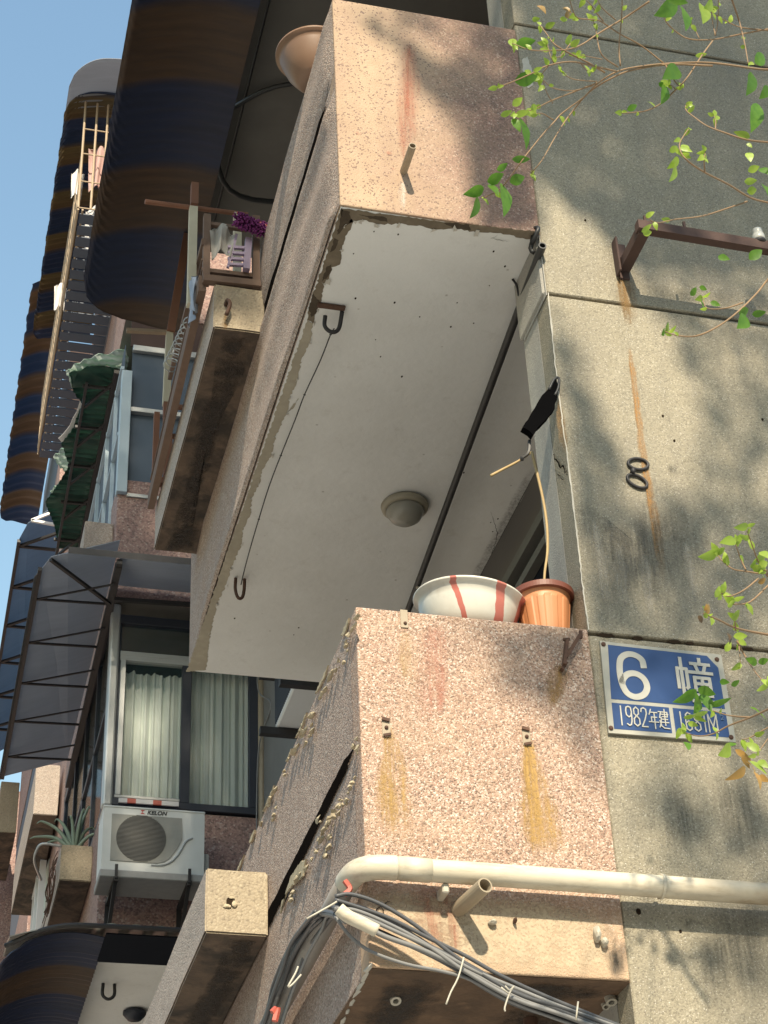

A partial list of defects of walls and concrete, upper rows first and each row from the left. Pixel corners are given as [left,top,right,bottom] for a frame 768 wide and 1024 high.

leakage [171,341,243,550]
peeling [186,208,535,672]
corrosion [629,357,659,552]
spalling [315,613,360,700]
spalling [249,712,315,843]
crack [268,749,353,928]
spalling [280,775,356,914]
corrosion [523,744,556,844]